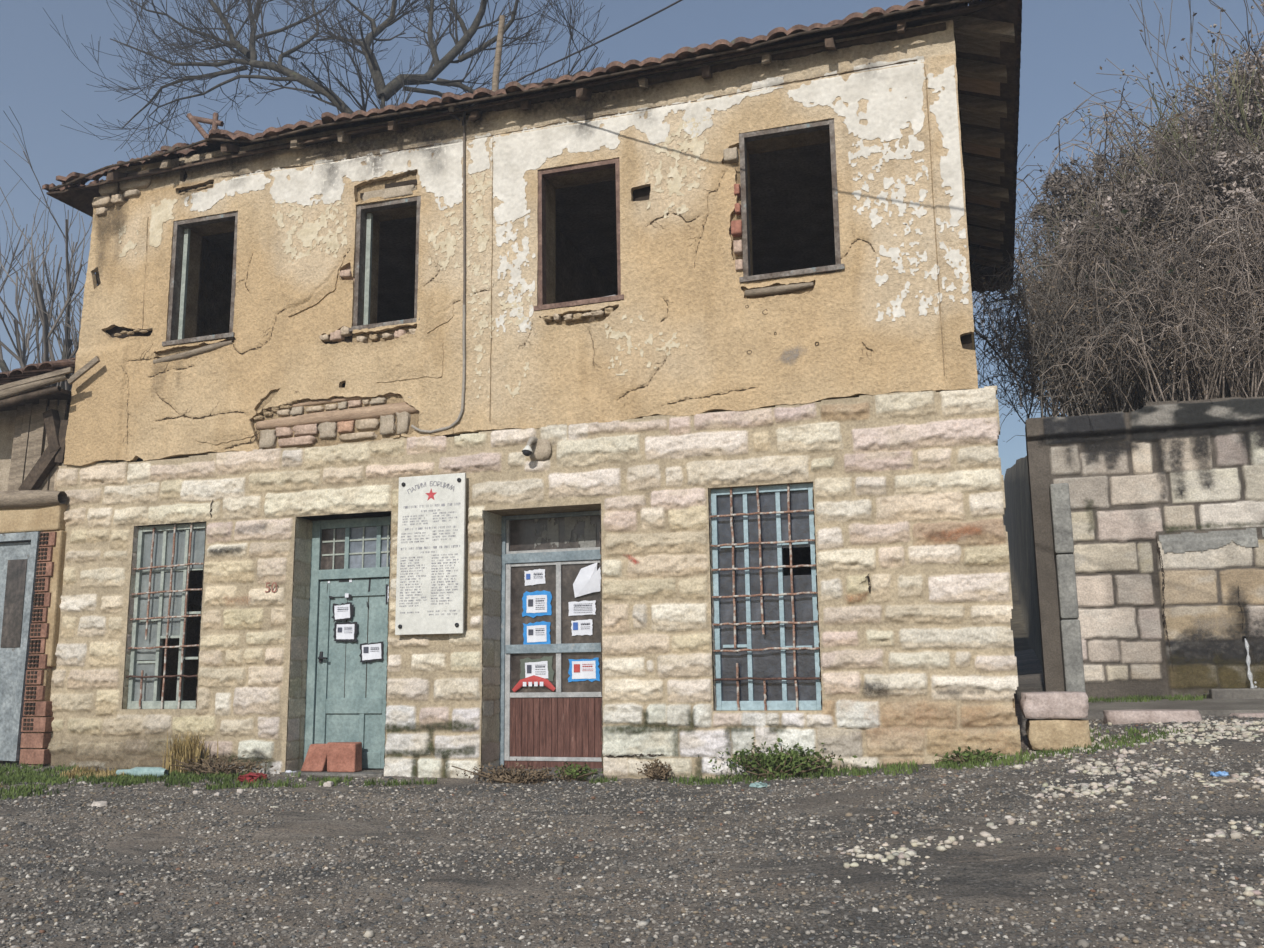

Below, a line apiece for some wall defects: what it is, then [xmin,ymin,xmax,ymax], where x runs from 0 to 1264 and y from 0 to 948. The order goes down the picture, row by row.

spalling [92,170,152,215]
peeling [119,56,969,398]
crack [647,174,724,268]
spalling [106,326,153,339]
crack [232,309,285,355]
crack [121,344,260,449]
spalling [253,382,419,449]
crack [619,355,755,410]
damp [1040,420,1264,498]
damp [1177,591,1264,664]